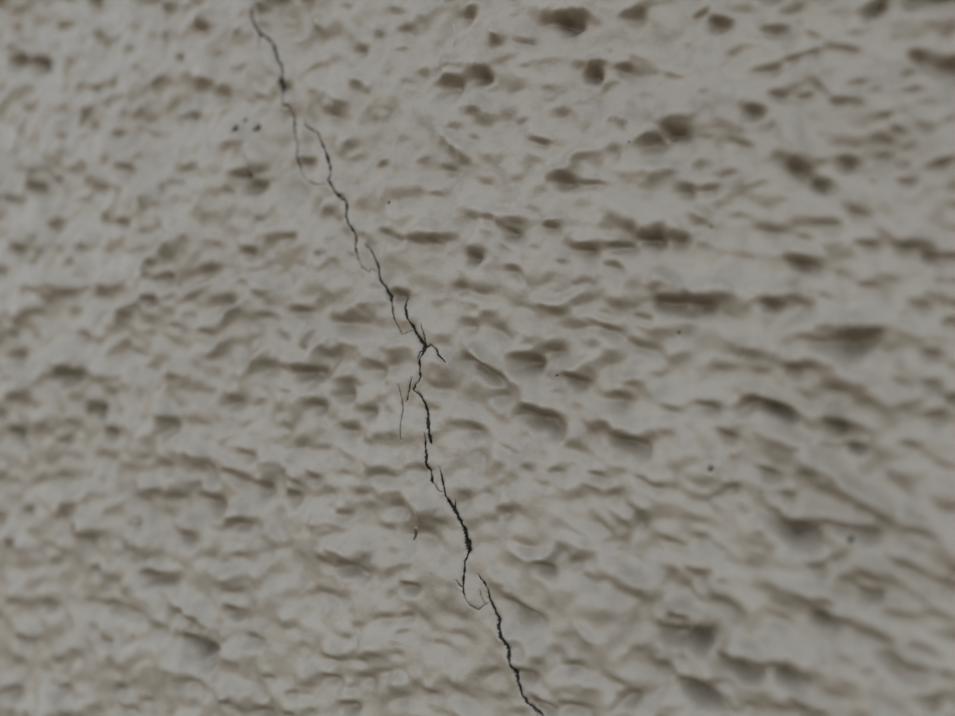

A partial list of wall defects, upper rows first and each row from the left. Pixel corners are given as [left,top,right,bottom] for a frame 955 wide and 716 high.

crack [250,1,544,716]